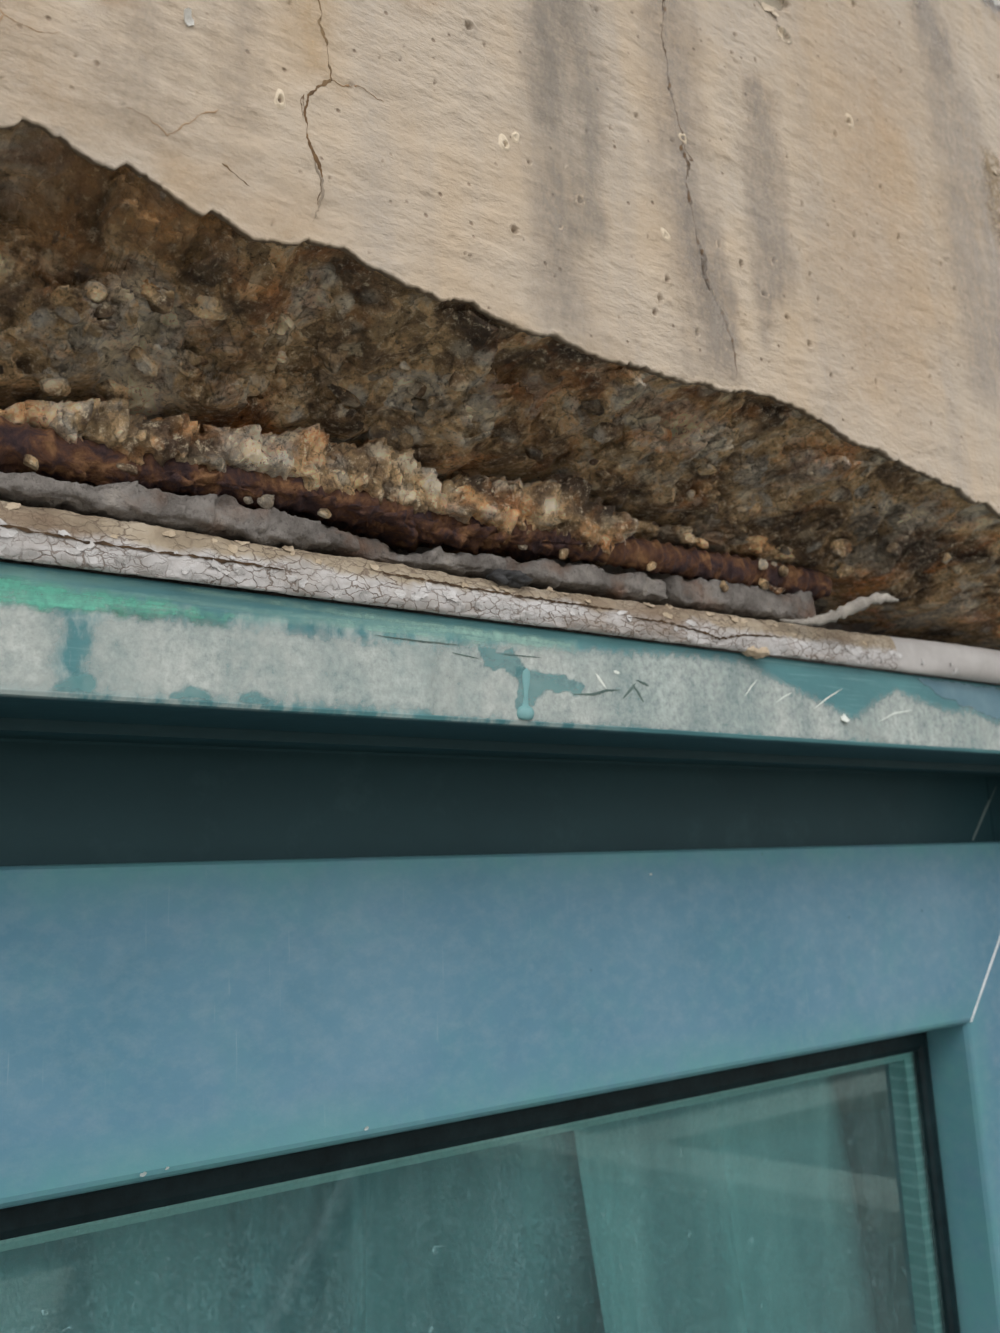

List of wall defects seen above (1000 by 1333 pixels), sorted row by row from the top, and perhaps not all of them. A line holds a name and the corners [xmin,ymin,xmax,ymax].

crack [0,9,60,34]
crack [300,0,383,221]
crack [661,0,737,375]
spalling [0,122,1000,750]